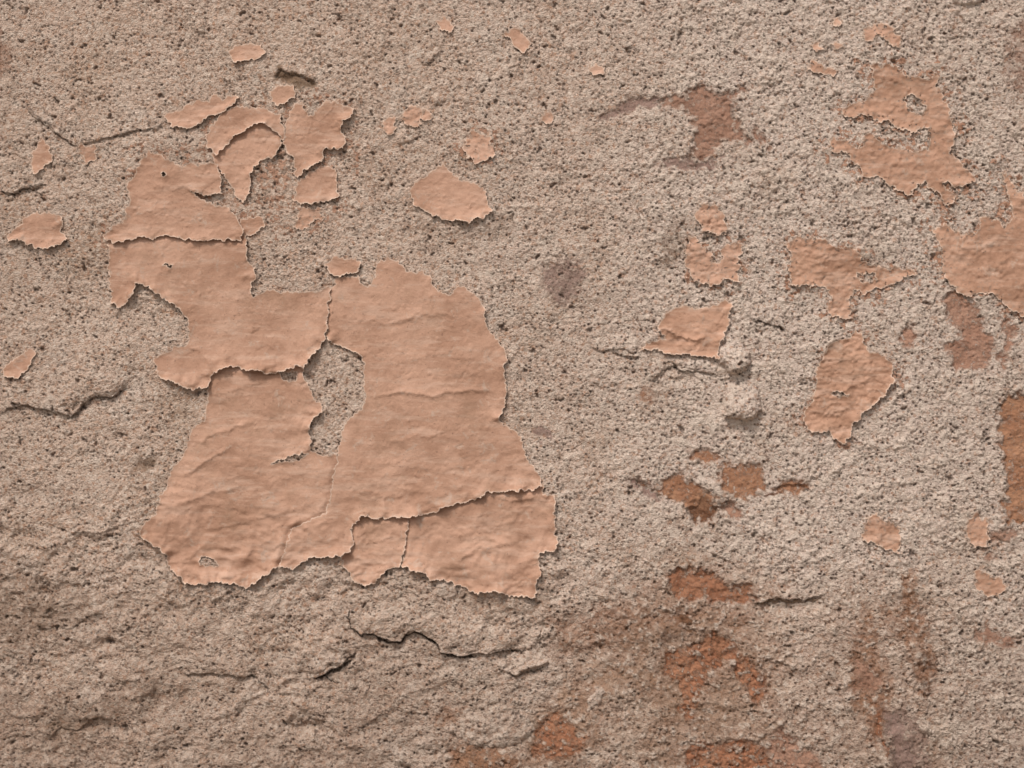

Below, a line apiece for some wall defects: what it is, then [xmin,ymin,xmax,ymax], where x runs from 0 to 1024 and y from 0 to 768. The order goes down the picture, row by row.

spalling [600,85,772,170]
peeling [7,211,67,249]
peeling [94,65,559,599]
peeling [640,202,753,360]
peeling [768,17,1024,450]
spalling [626,451,808,523]
spalling [961,393,1024,598]
crack [314,611,540,683]